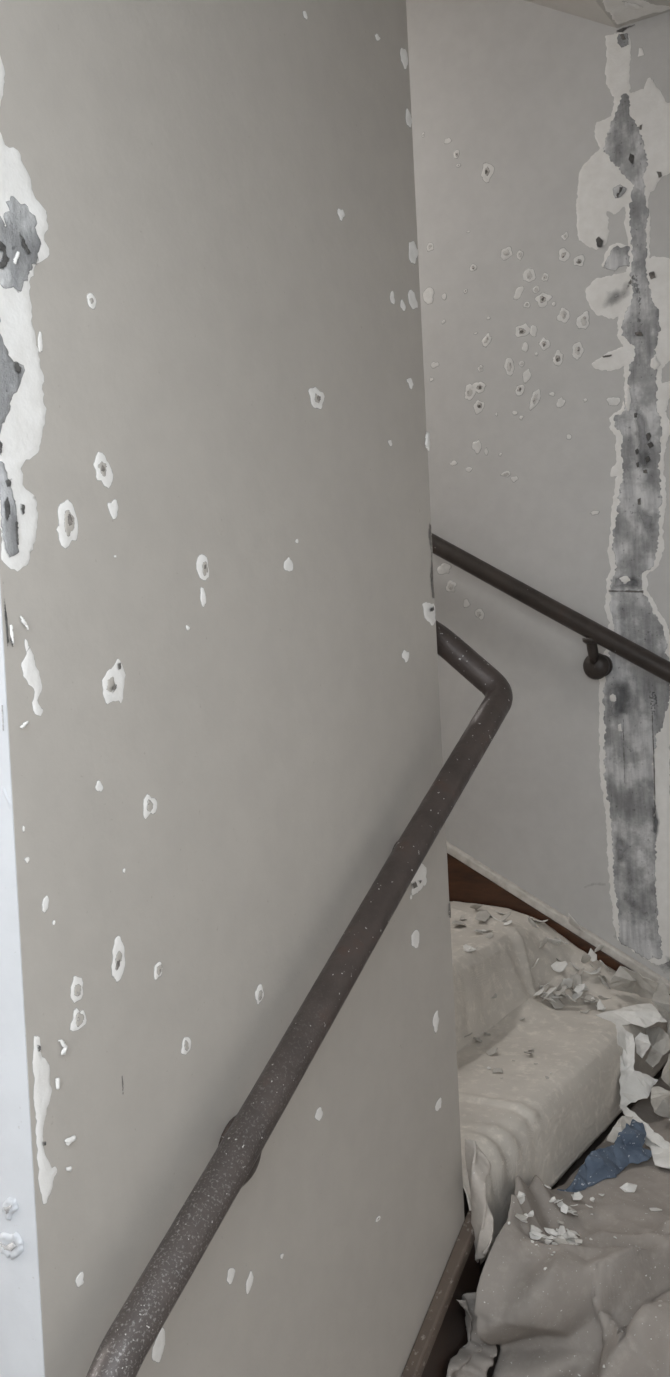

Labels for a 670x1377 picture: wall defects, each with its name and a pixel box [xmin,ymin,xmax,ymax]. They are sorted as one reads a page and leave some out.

peeling [0,132,50,572]
peeling [500,0,670,661]
peeling [308,387,325,409]
peeling [93,452,118,519]
peeling [56,499,78,549]
peeling [196,554,209,607]
peeling [1,616,43,731]
peeling [102,659,126,704]
peeling [527,649,670,1169]
peeling [111,936,125,982]
peeling [32,976,87,1204]